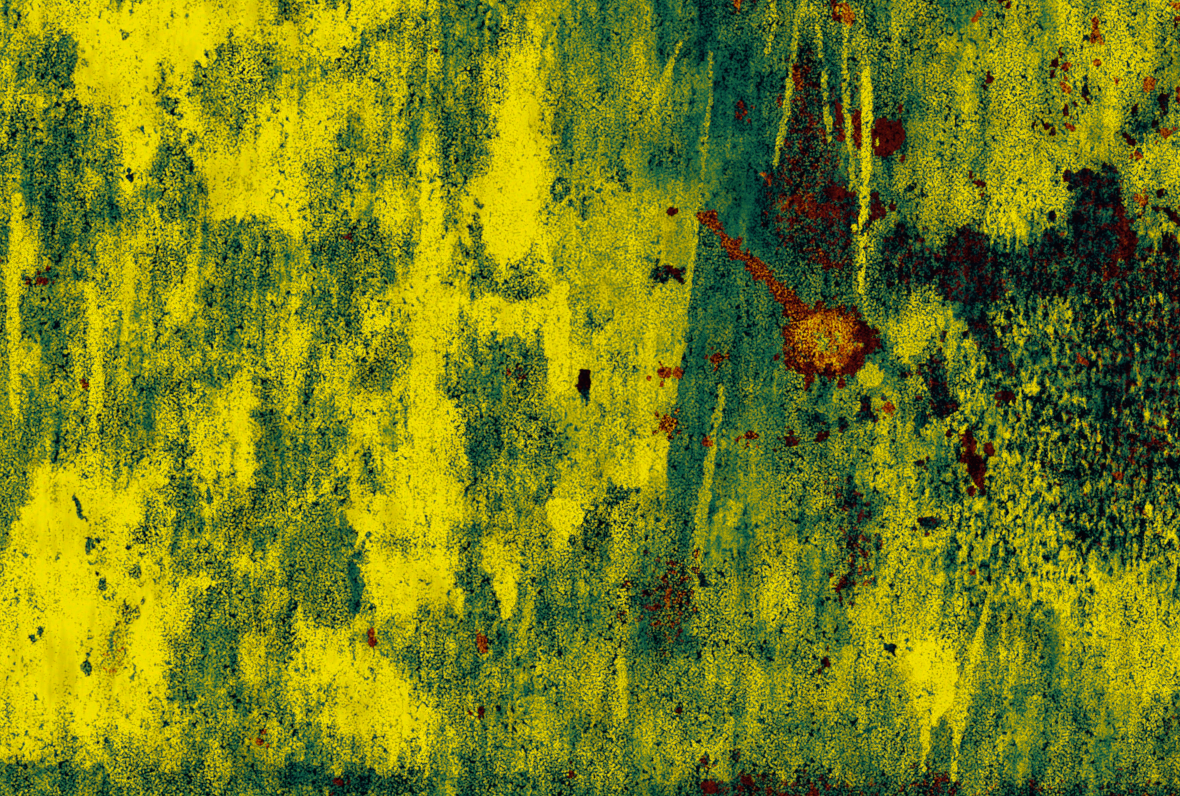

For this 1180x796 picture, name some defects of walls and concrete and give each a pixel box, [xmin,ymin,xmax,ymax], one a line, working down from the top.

corrosion [717,0,775,16]
corrosion [1169,1,1180,44]
corrosion [735,100,755,123]
corrosion [760,38,906,280]
corrosion [1134,188,1149,207]
corrosion [696,208,882,392]
corrosion [875,401,895,419]